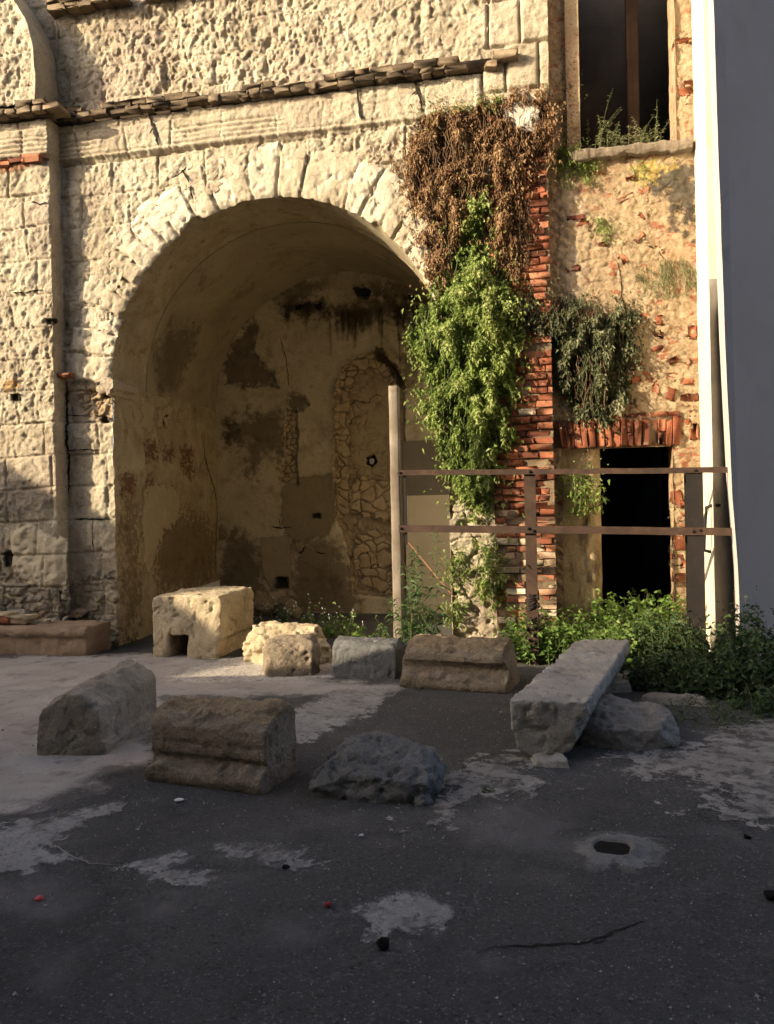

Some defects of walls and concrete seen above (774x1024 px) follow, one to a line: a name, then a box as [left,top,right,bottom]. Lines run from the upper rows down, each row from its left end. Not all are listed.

flaking render [553,170,667,314]
damp [274,276,429,384]
spalling [375,346,404,388]
flaking render [614,306,700,442]
crack [475,921,644,955]